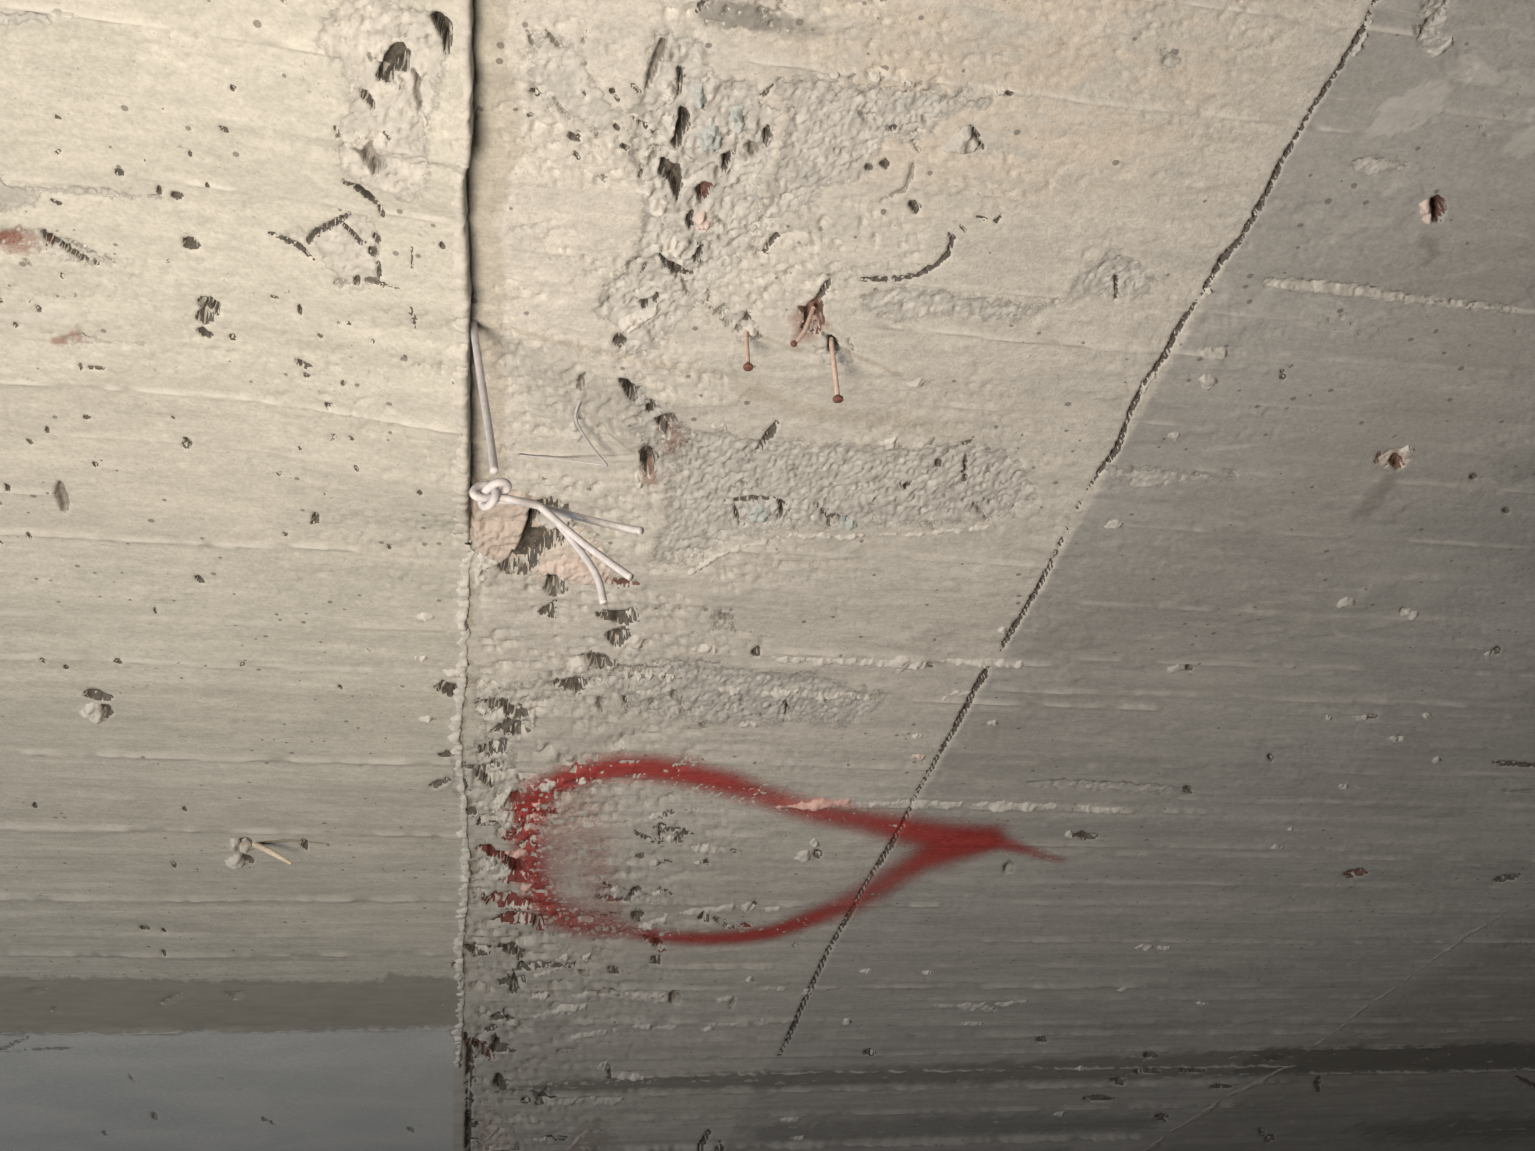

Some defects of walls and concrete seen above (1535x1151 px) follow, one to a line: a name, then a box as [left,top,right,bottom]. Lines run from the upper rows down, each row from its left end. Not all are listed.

crack [777,0,1379,1056]